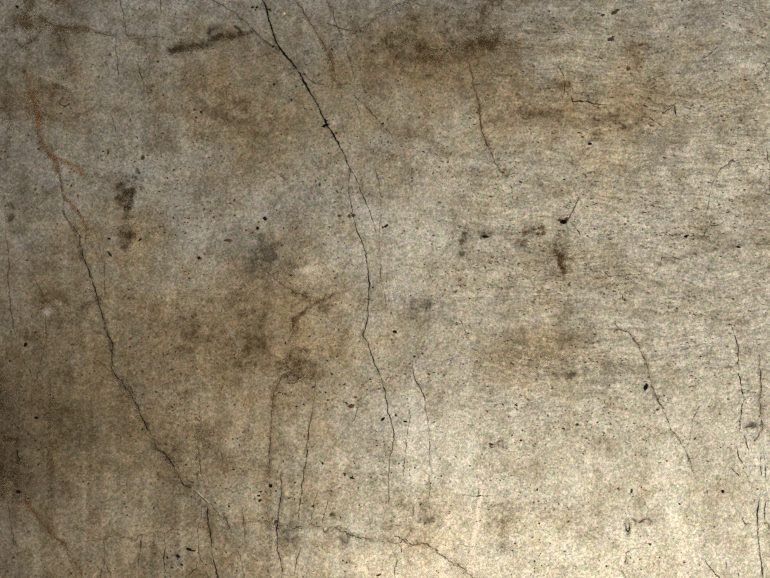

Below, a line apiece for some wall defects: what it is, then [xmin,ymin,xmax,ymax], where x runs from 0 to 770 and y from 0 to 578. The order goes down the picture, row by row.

crack [42,0,161,88]
crack [463,38,514,200]
crack [558,65,612,108]
crack [213,0,430,503]
crack [0,175,486,578]
crack [756,500,770,575]